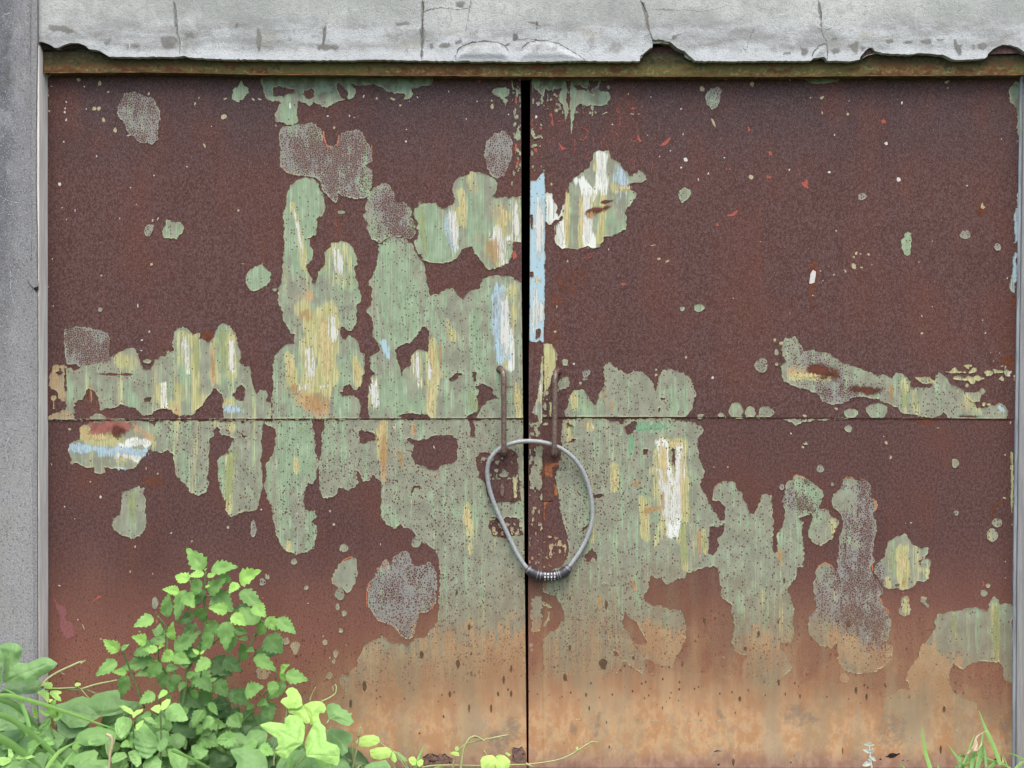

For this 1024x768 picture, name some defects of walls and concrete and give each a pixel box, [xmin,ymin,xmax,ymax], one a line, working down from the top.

crack [640,0,718,42]
crack [818,1,831,42]
spalling [41,43,92,53]
spalling [640,40,692,60]
spalling [988,46,1021,55]
peeling [48,77,1015,721]
rust [422,754,453,766]
rust [511,747,526,763]